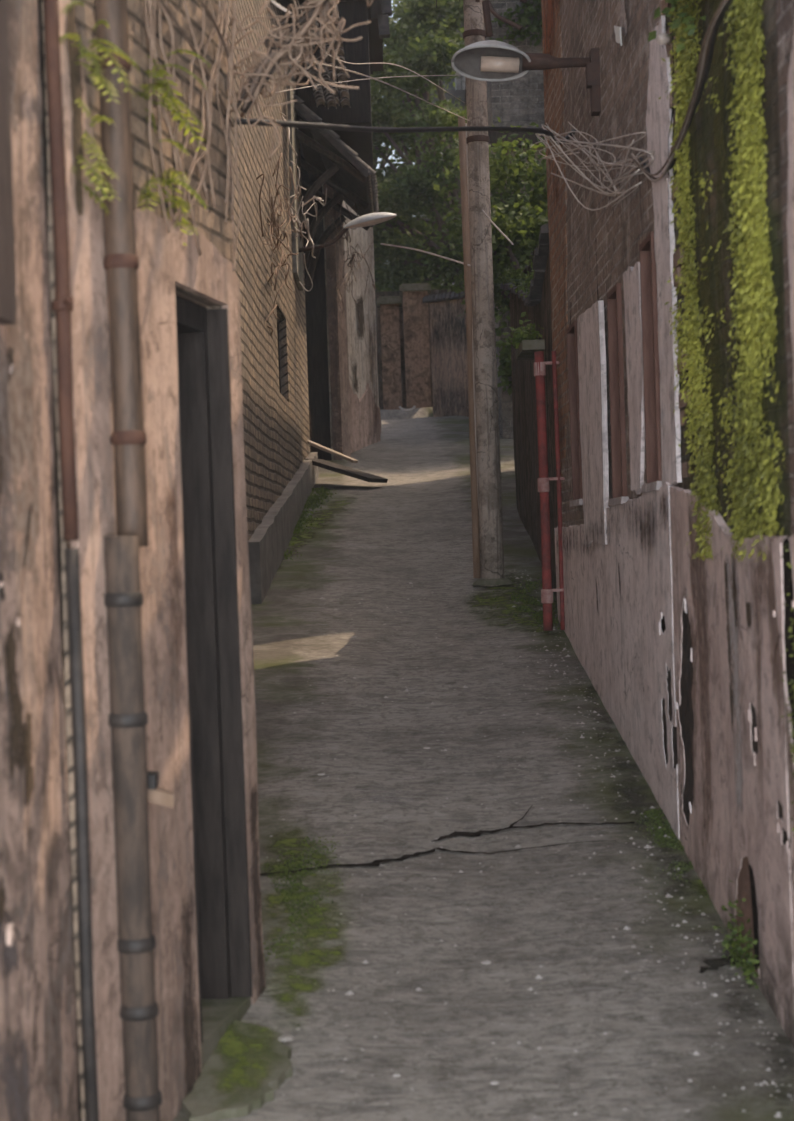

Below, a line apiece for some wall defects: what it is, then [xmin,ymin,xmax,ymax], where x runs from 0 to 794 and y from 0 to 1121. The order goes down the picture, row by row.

flaking render [658,612,666,635]
flaking render [662,597,694,826]
crack [495,806,635,853]